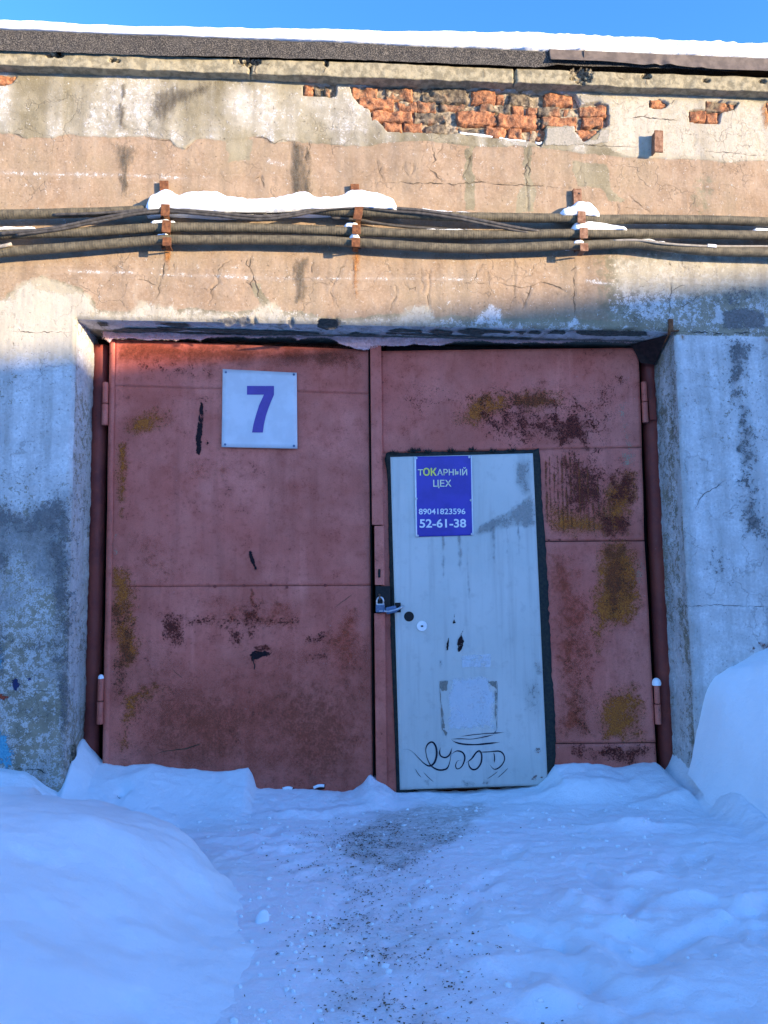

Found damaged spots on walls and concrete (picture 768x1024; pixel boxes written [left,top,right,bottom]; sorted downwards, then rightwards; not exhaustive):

flaking render [303,85,336,98]
flaking render [351,87,607,147]
flaking render [688,101,737,124]
damp [118,149,129,189]
damp [291,142,310,193]
crack [375,144,569,203]
crack [210,259,259,302]
crack [667,262,757,335]
damp [725,337,768,546]
rust [406,375,656,765]
rust [161,589,299,648]
rust [105,566,163,750]